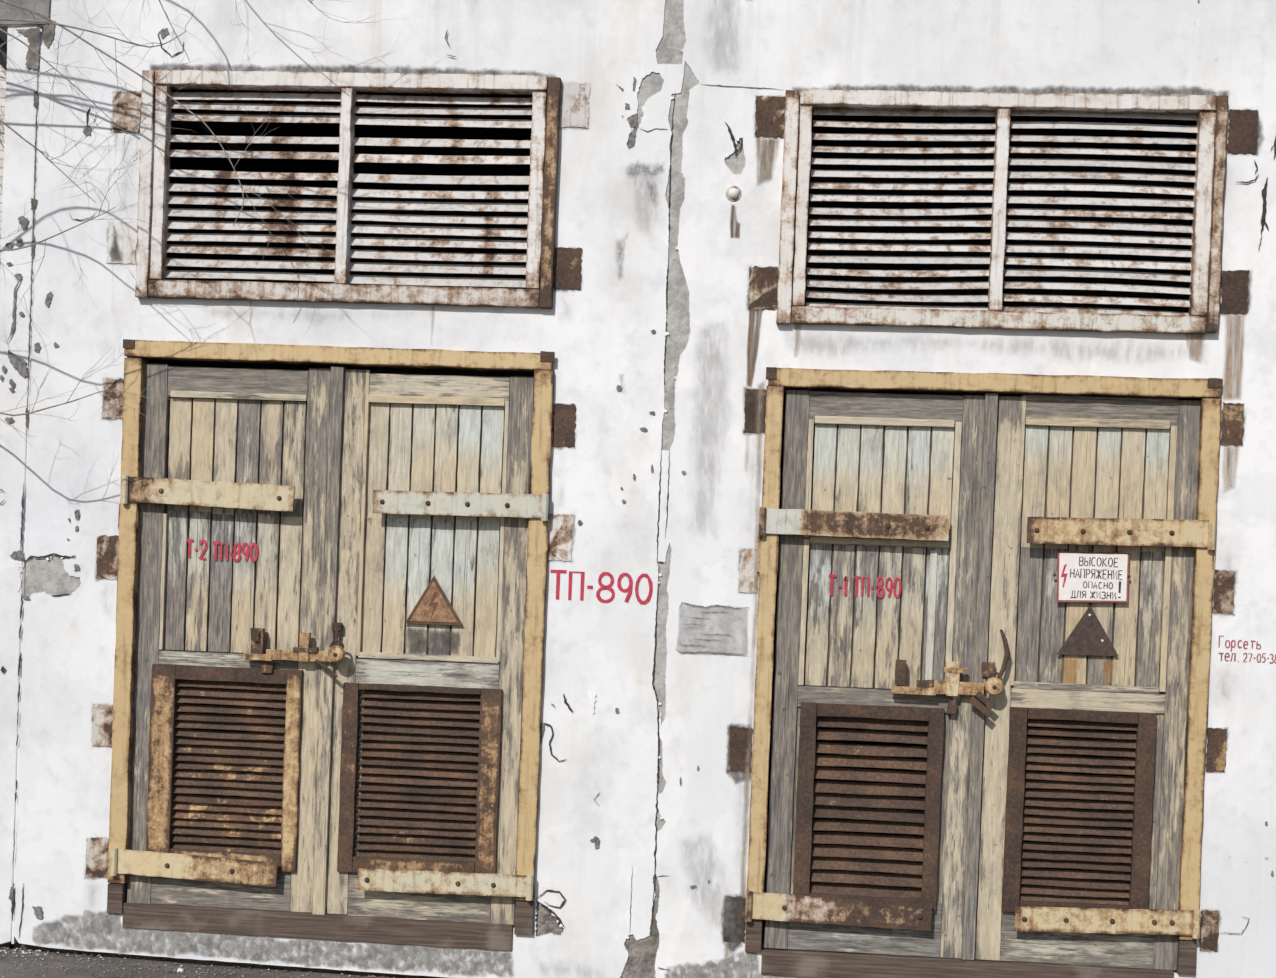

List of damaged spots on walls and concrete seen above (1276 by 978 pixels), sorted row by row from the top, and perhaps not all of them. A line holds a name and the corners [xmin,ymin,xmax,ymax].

peeling [616,72,674,149]
crack [664,84,784,386]
crack [1236,137,1276,251]
spalling [9,550,81,600]
spalling [535,902,566,936]
spalling [620,876,660,978]